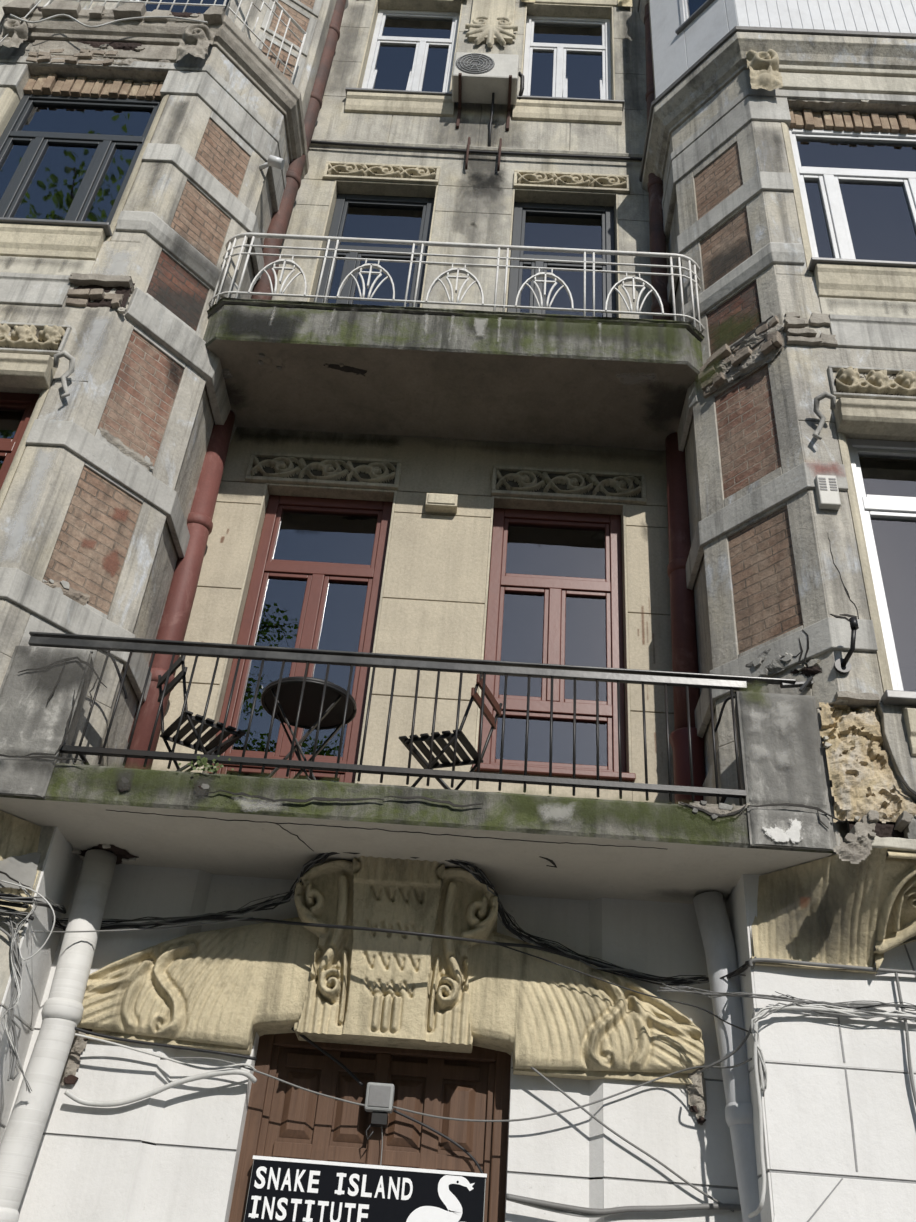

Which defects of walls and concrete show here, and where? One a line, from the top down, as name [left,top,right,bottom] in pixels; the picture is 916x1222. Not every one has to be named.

damp [468,153,501,194]
flaking render [698,312,838,398]
flaking render [819,691,916,842]
damp [542,808,569,818]
peeling [763,819,804,844]